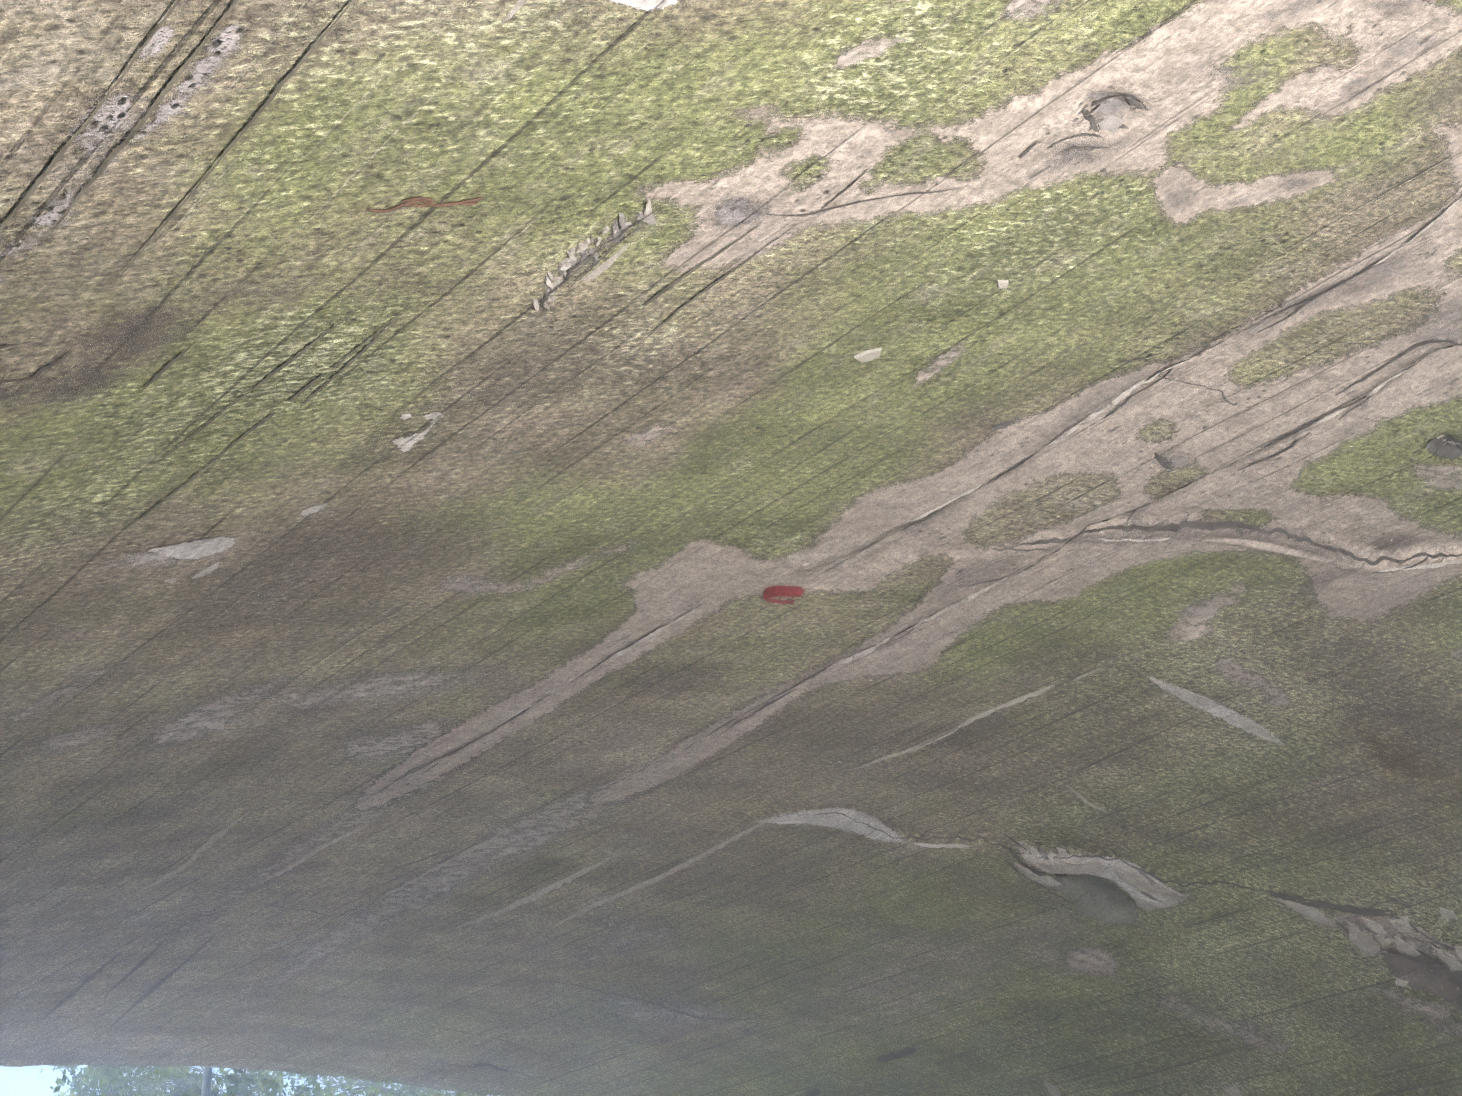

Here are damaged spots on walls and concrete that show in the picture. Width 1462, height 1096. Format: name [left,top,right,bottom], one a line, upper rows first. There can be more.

peeling [532,0,1462,313]
water stain [117,536,235,583]
water stain [299,503,328,516]
water stain [392,412,443,452]
peeling [352,121,1462,810]
crack [807,195,1462,571]
crack [580,483,1462,800]
peeling [755,807,904,843]
spalling [1002,841,1188,925]
spalling [1269,893,1462,1043]